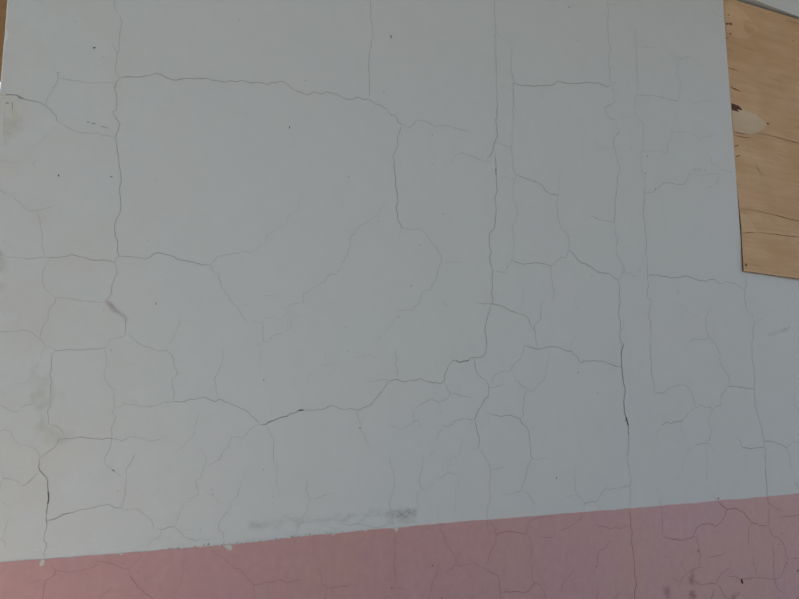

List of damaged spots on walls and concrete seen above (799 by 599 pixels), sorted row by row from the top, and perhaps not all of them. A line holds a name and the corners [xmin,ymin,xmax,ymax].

crack [0,0,594,599]
crack [445,52,768,339]
crack [538,306,637,599]
crack [650,303,799,599]